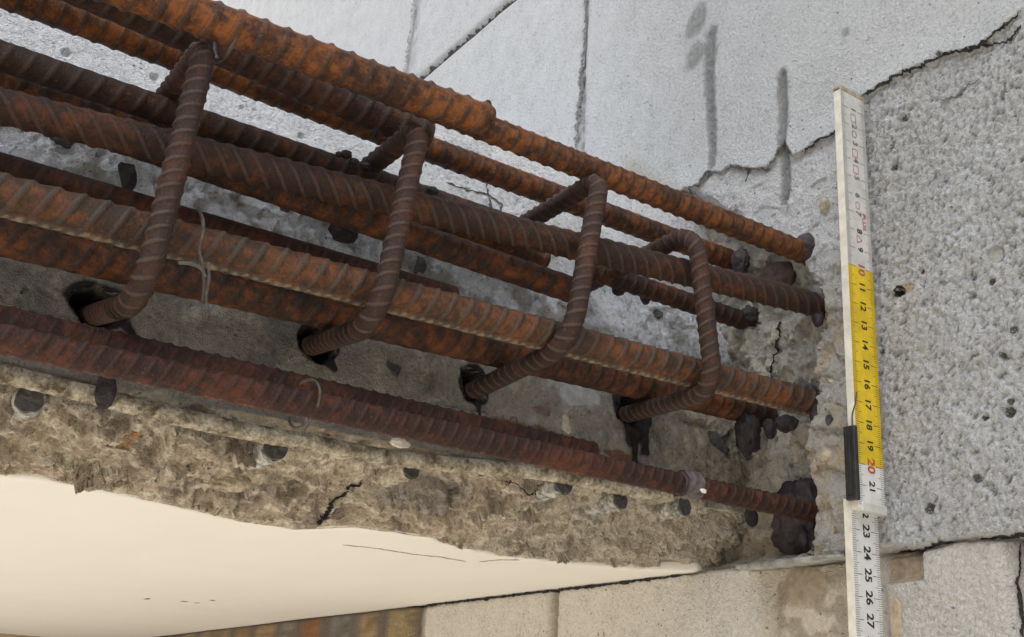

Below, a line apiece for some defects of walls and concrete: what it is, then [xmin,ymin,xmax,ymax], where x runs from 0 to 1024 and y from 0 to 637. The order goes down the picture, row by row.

crack [862,10,1021,97]
crack [942,79,980,101]
spalling [0,0,826,330]
crack [681,130,835,194]
spalling [367,270,562,368]
crack [769,321,781,378]
spalling [0,305,702,495]
spalling [683,365,820,427]
crack [316,480,363,525]
spalling [698,478,819,522]